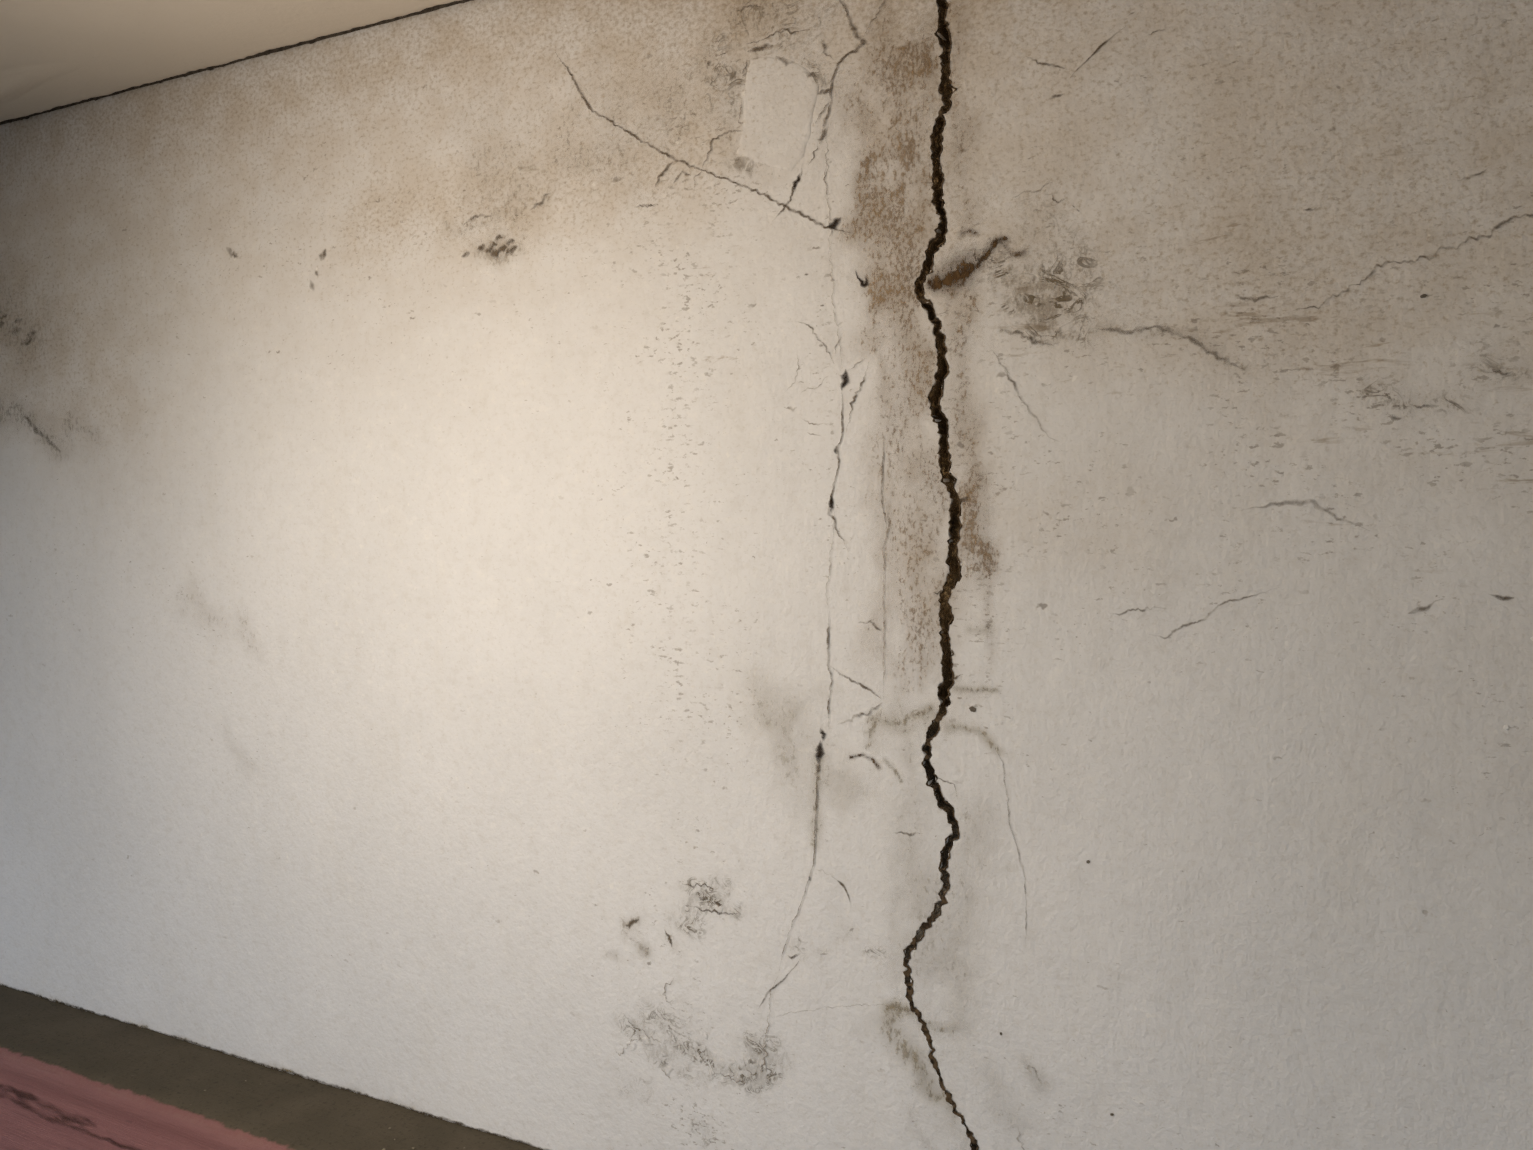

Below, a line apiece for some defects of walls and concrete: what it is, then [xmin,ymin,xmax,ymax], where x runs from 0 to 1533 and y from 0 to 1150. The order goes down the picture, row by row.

crack [562,3,873,233]
crack [798,274,864,569]
damp [845,19,999,679]
crack [1465,215,1533,243]
crack [827,607,885,723]
crack [903,0,979,1150]
crack [763,788,849,1034]